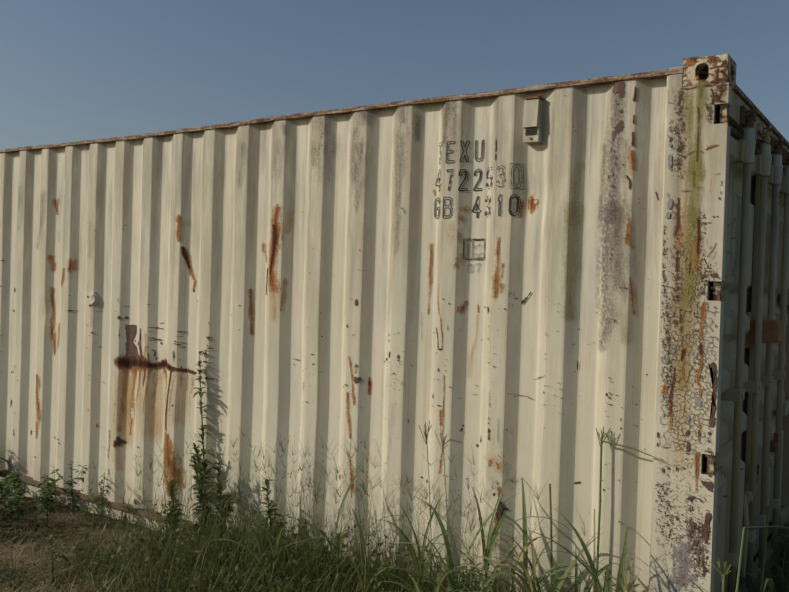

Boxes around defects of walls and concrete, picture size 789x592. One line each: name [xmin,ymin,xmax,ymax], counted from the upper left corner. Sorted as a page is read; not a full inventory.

rust [680,60,728,103]
rust [626,115,635,190]
water stain [688,89,702,221]
rust [48,254,79,355]
rust [174,215,196,292]
rust [261,204,290,319]
rust [492,237,513,306]
water stain [597,82,625,350]
rust [108,328,196,497]
crack [654,212,717,588]
peeling [655,193,720,592]